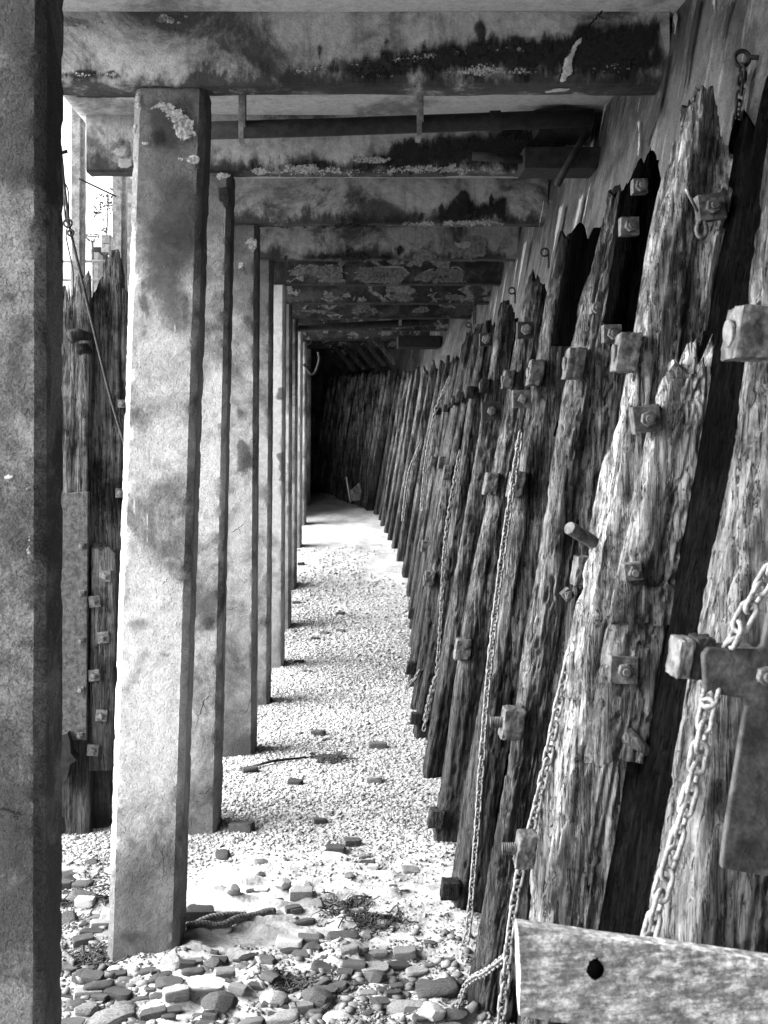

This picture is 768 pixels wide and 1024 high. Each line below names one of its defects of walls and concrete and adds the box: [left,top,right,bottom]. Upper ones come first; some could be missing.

damp [316,17,664,93]
damp [151,98,191,144]
damp [279,160,336,174]
damp [353,129,565,176]
damp [437,190,507,224]
peeling [289,218,505,324]